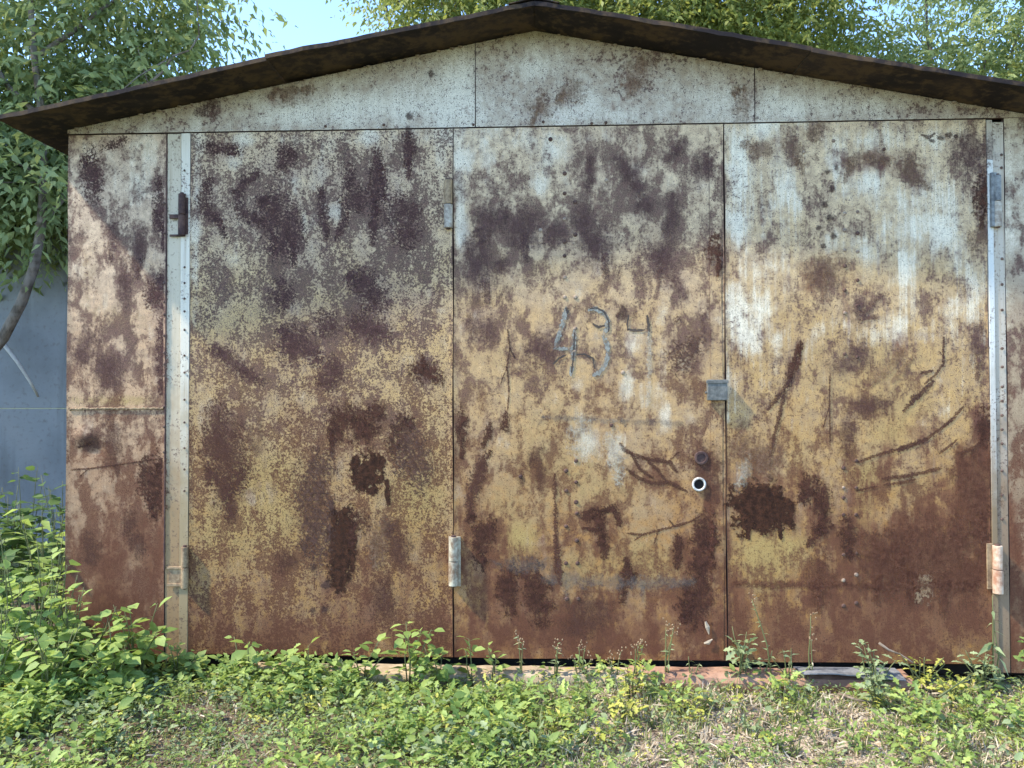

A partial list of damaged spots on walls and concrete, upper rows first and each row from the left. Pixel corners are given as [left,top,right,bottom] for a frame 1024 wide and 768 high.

corrosion [79,134,127,205]
corrosion [921,131,995,248]
corrosion [105,174,169,395]
corrosion [195,113,425,461]
corrosion [408,353,447,387]
corrosion [124,445,169,560]
corrosion [198,396,263,527]
corrosion [451,404,564,630]
corrosion [579,504,622,560]
corrosion [672,450,723,633]
corrosion [794,470,859,611]
corrosion [946,403,1002,540]